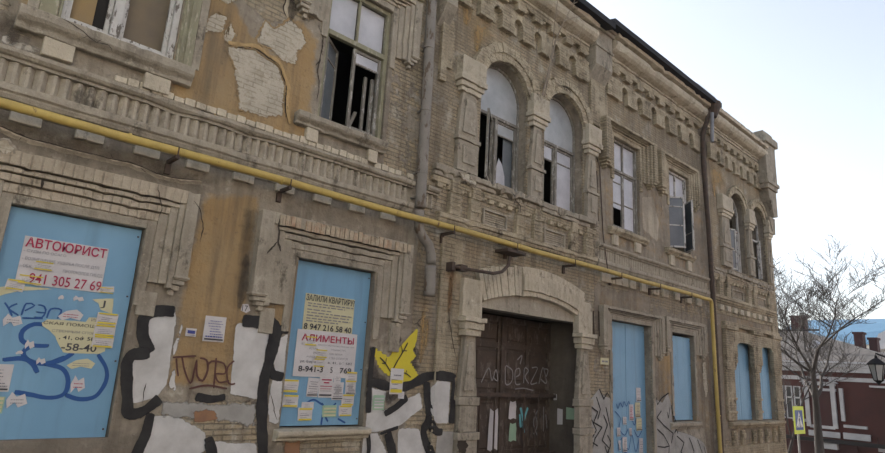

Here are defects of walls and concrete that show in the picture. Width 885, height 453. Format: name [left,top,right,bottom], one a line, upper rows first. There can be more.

peeling [206,0,308,118]
flaking render [194,409,217,422]